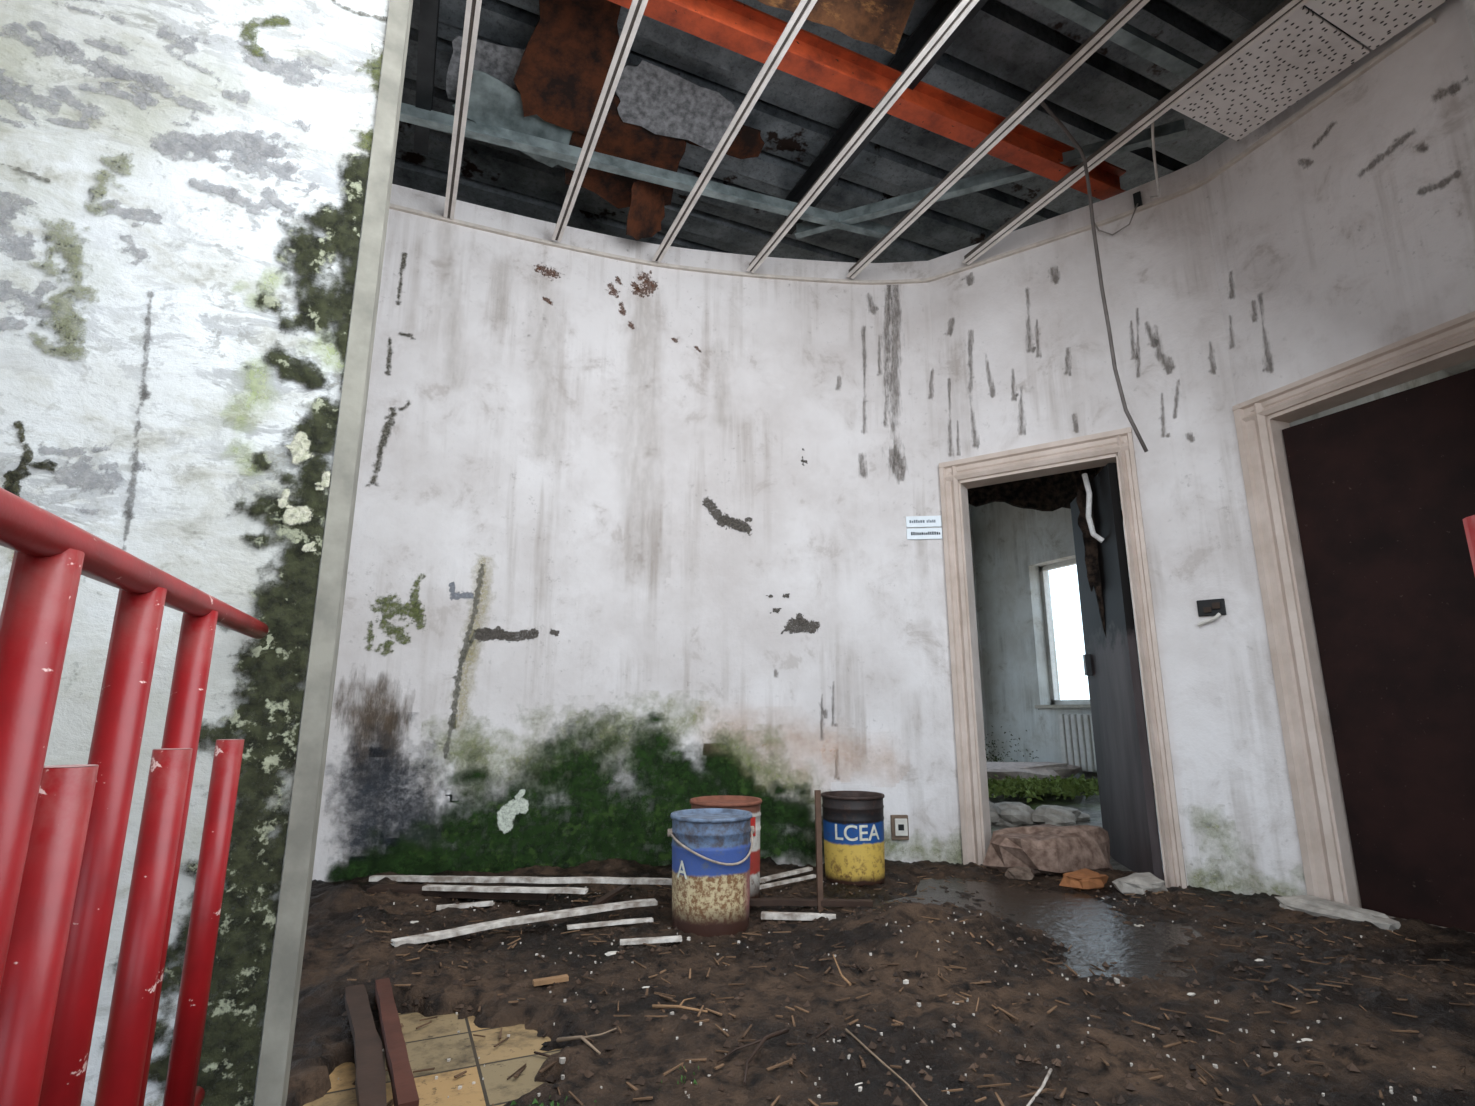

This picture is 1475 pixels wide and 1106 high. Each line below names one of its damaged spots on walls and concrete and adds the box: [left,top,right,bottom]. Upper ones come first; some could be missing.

peeling [66,0,124,23]
peeling [0,21,327,217]
peeling [0,191,36,260]
peeling [100,199,162,265]
peeling [0,280,57,331]
water stain [396,253,407,305]
water stain [385,333,416,375]
water stain [863,285,900,427]
water stain [1131,309,1179,437]
water stain [367,402,410,486]
spalling [702,497,753,536]
water stain [336,678,443,861]